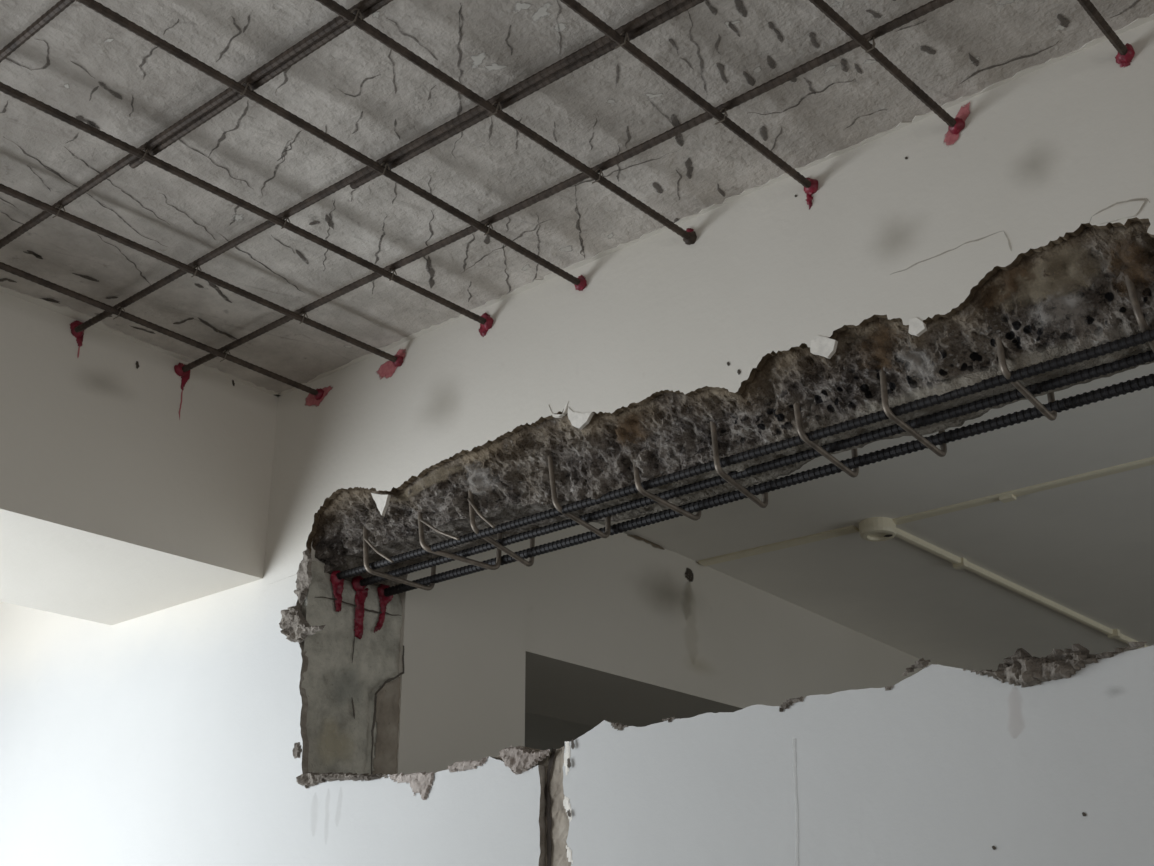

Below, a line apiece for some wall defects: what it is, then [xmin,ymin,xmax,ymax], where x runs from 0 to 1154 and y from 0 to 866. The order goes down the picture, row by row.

crack [216,15,250,62]
crack [452,3,463,155]
crack [958,41,1059,85]
crack [179,102,292,195]
crack [29,156,214,285]
spalling [279,201,1154,643]
spalling [292,742,302,759]
spalling [779,696,804,712]
spalling [902,658,931,676]
spalling [963,641,1147,688]
spalling [448,739,575,866]
crack [544,748,556,866]